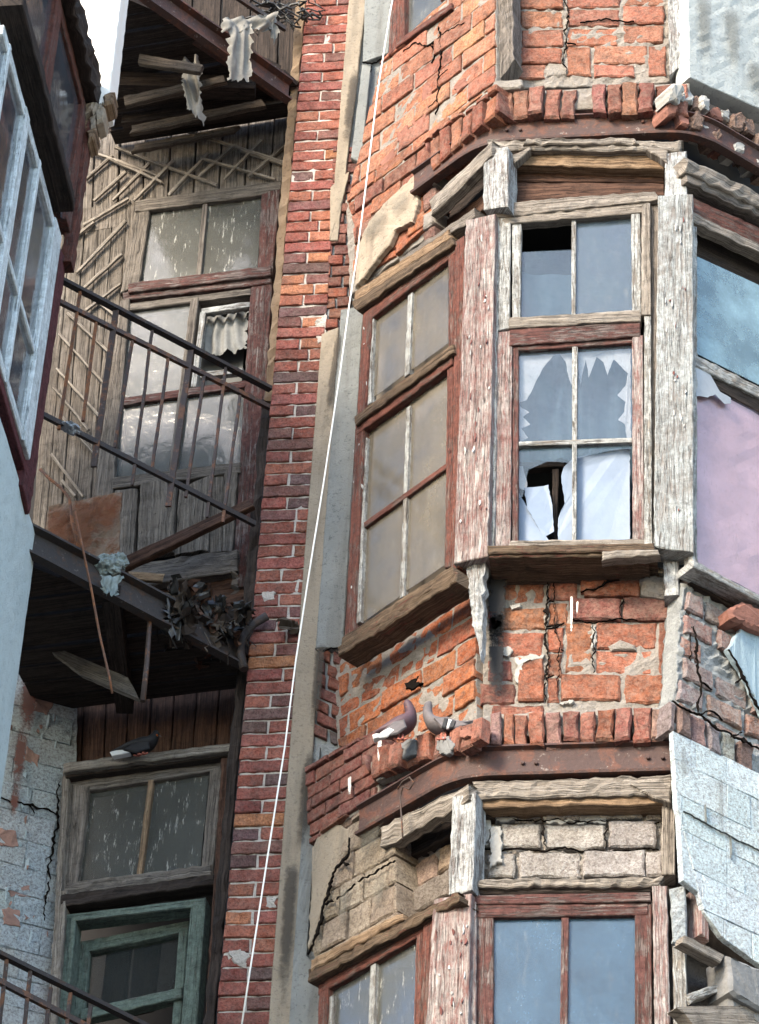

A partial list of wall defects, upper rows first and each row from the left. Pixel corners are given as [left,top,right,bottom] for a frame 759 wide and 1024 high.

crack [362,22,464,115]
crack [562,0,634,75]
rust [46,496,119,546]
spalling [404,676,424,691]
spalling [503,646,545,685]
crack [543,579,640,702]
crack [672,611,759,750]
spalling [0,746,40,847]
spalling [388,738,418,764]
spalling [2,885,34,944]
crack [1,782,60,921]
crack [307,837,396,955]